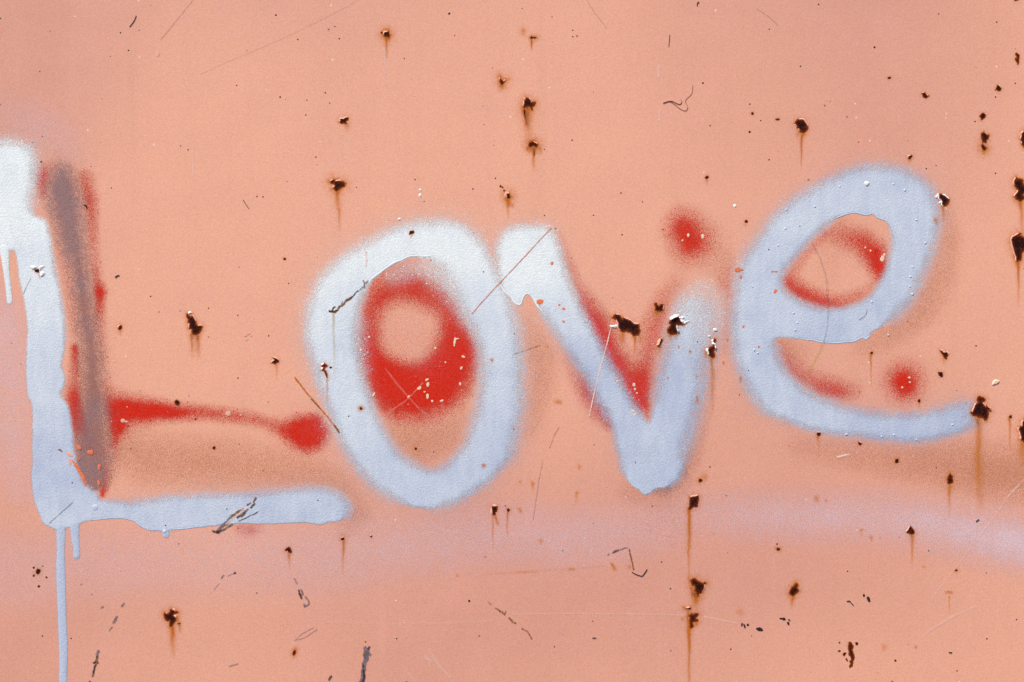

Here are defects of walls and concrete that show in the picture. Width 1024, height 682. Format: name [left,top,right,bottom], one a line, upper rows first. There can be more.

corrosion [522,97,539,162]
corrosion [794,118,808,157]
corrosion [328,178,346,214]
corrosion [1013,176,1024,218]
corrosion [1010,232,1024,284]
corrosion [186,311,203,346]
corrosion [609,314,641,345]
corrosion [654,302,691,352]
corrosion [970,395,991,482]
corrosion [687,479,703,551]
corrosion [163,608,181,642]
corrosion [682,577,707,679]